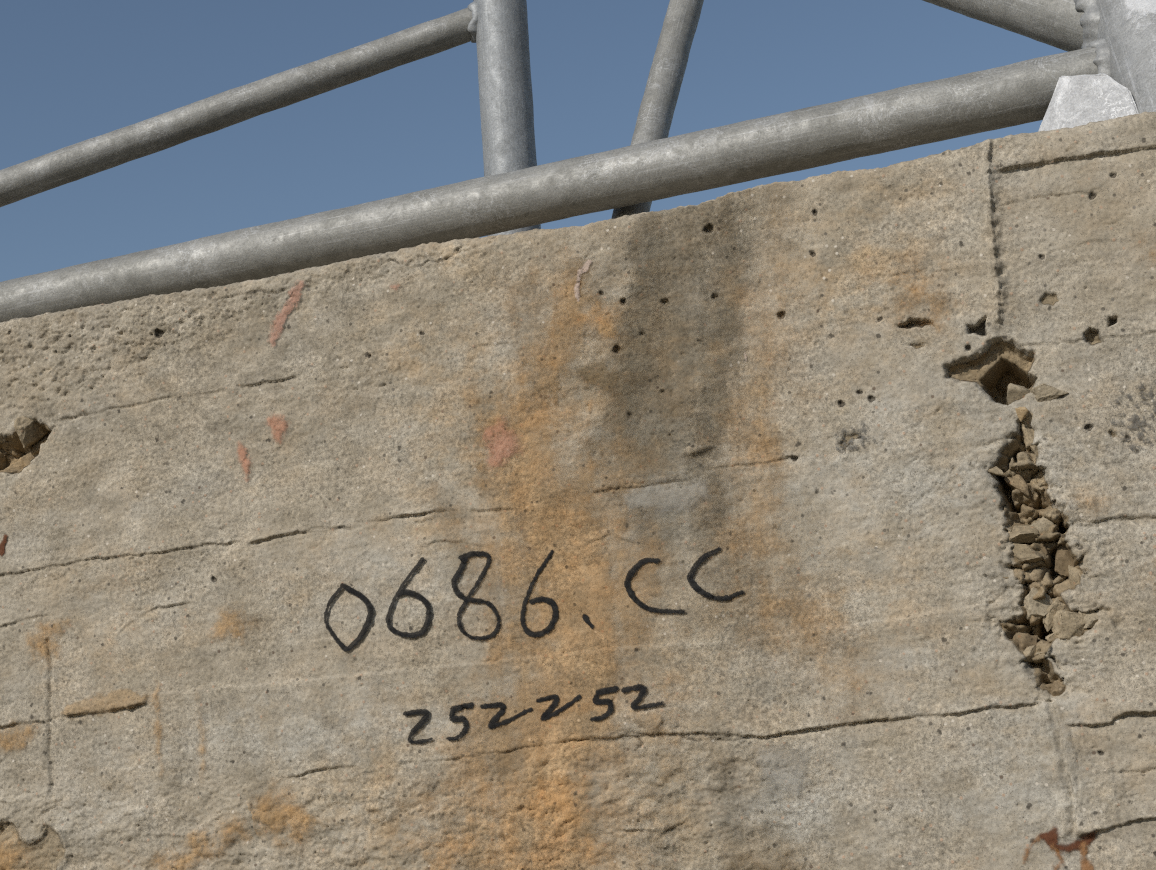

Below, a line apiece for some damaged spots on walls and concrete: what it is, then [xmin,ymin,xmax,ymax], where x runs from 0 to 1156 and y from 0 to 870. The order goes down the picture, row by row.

leakage [575,197,740,532]
rust [448,269,639,870]
rust [1023,828,1096,870]